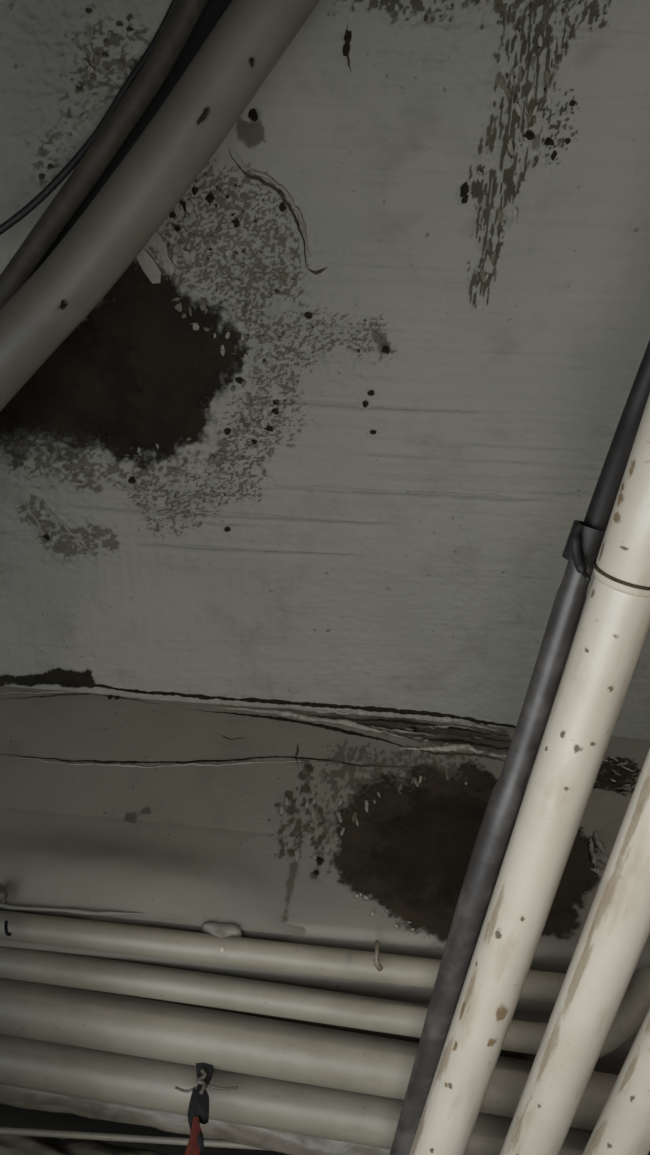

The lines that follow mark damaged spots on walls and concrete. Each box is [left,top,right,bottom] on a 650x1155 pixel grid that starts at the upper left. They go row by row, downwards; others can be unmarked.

crack [229,149,328,275]
damp [351,0,611,307]
damp [0,261,262,488]
crack [0,683,516,769]
damp [318,740,497,942]
damp [541,827,608,939]